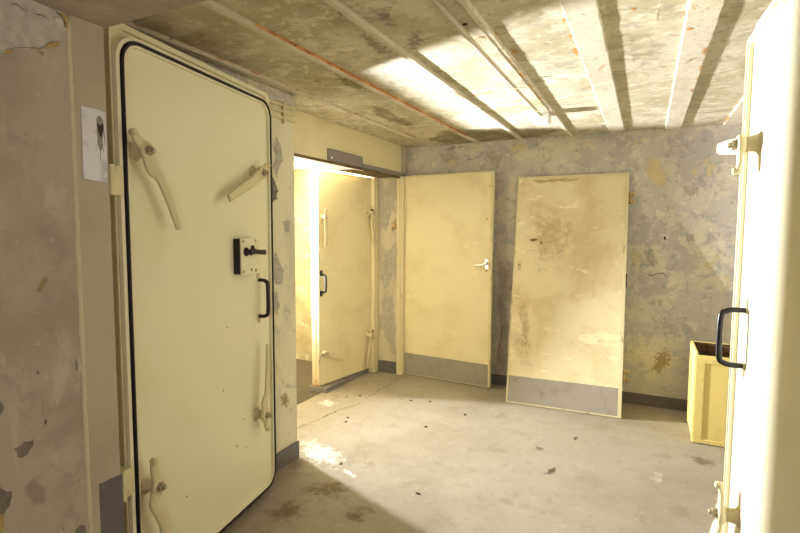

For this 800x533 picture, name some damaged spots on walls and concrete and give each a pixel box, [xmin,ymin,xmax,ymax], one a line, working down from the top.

peeling [0,0,68,56]
corrosion [255,23,467,136]
flaking render [15,440,34,458]
flaking render [0,487,12,533]